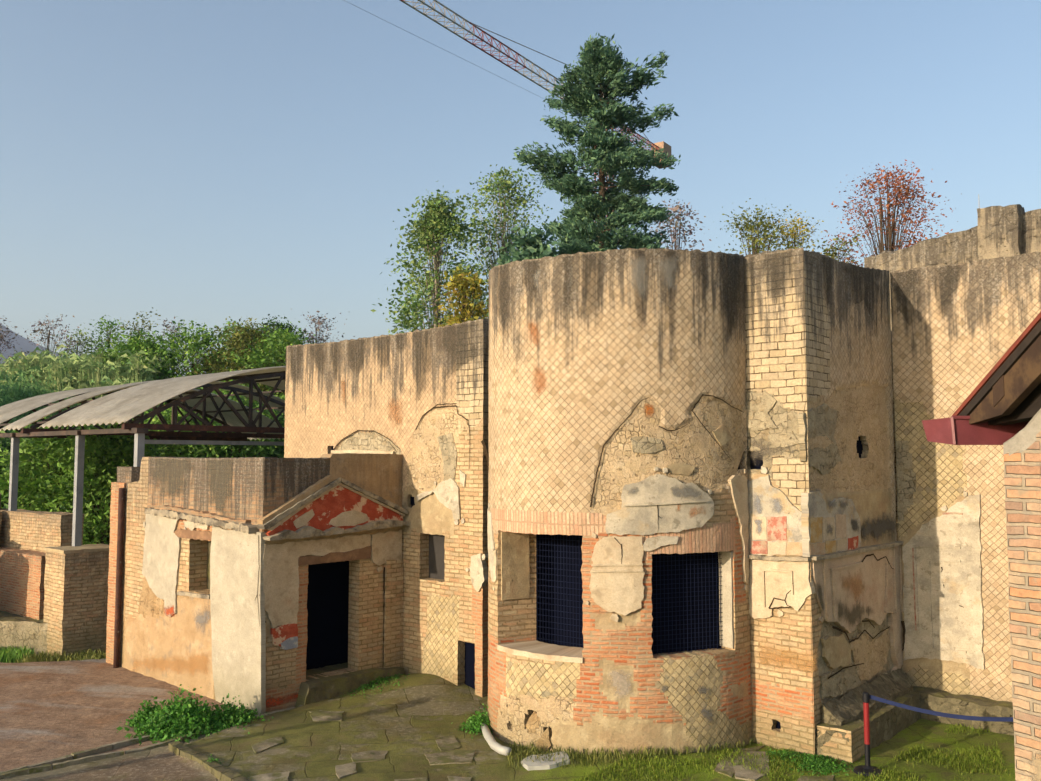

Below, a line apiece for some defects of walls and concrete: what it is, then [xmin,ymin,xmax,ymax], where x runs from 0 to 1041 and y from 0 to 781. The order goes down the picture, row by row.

peeling [142,514,212,617]
peeling [465,502,501,592]
peeling [586,392,985,699]
spalling [526,711,552,751]